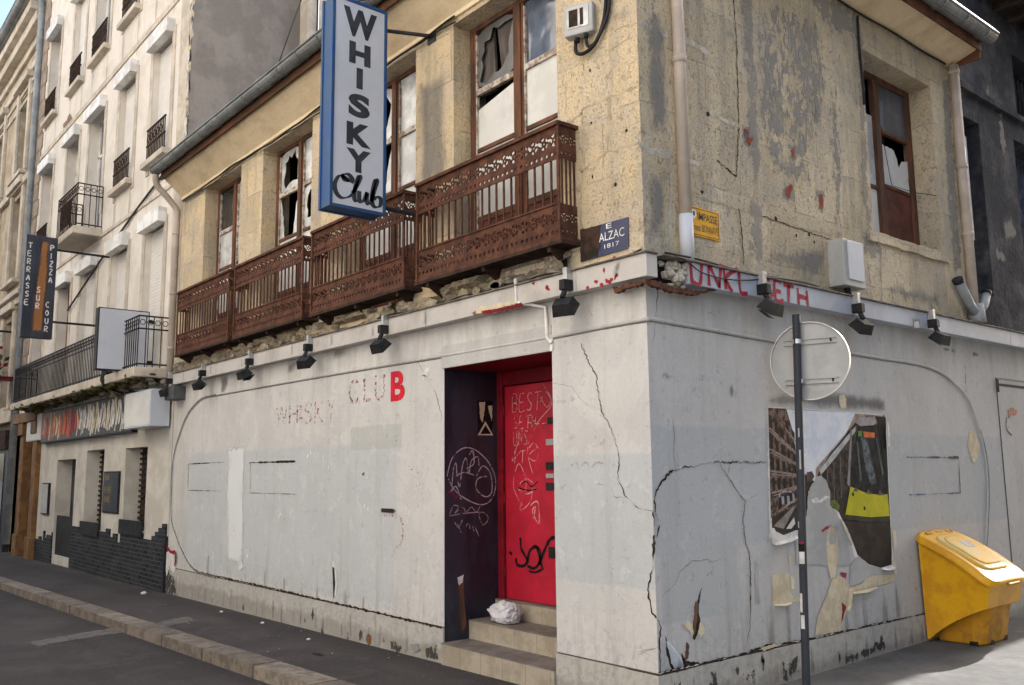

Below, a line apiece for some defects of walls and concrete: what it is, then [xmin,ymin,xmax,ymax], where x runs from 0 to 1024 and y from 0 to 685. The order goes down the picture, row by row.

spalling [742,125,754,147]
peeling [758,6,845,212]
spalling [95,250,572,399]
spalling [612,260,716,296]
crack [554,343,768,671]
flaking render [683,588,705,640]